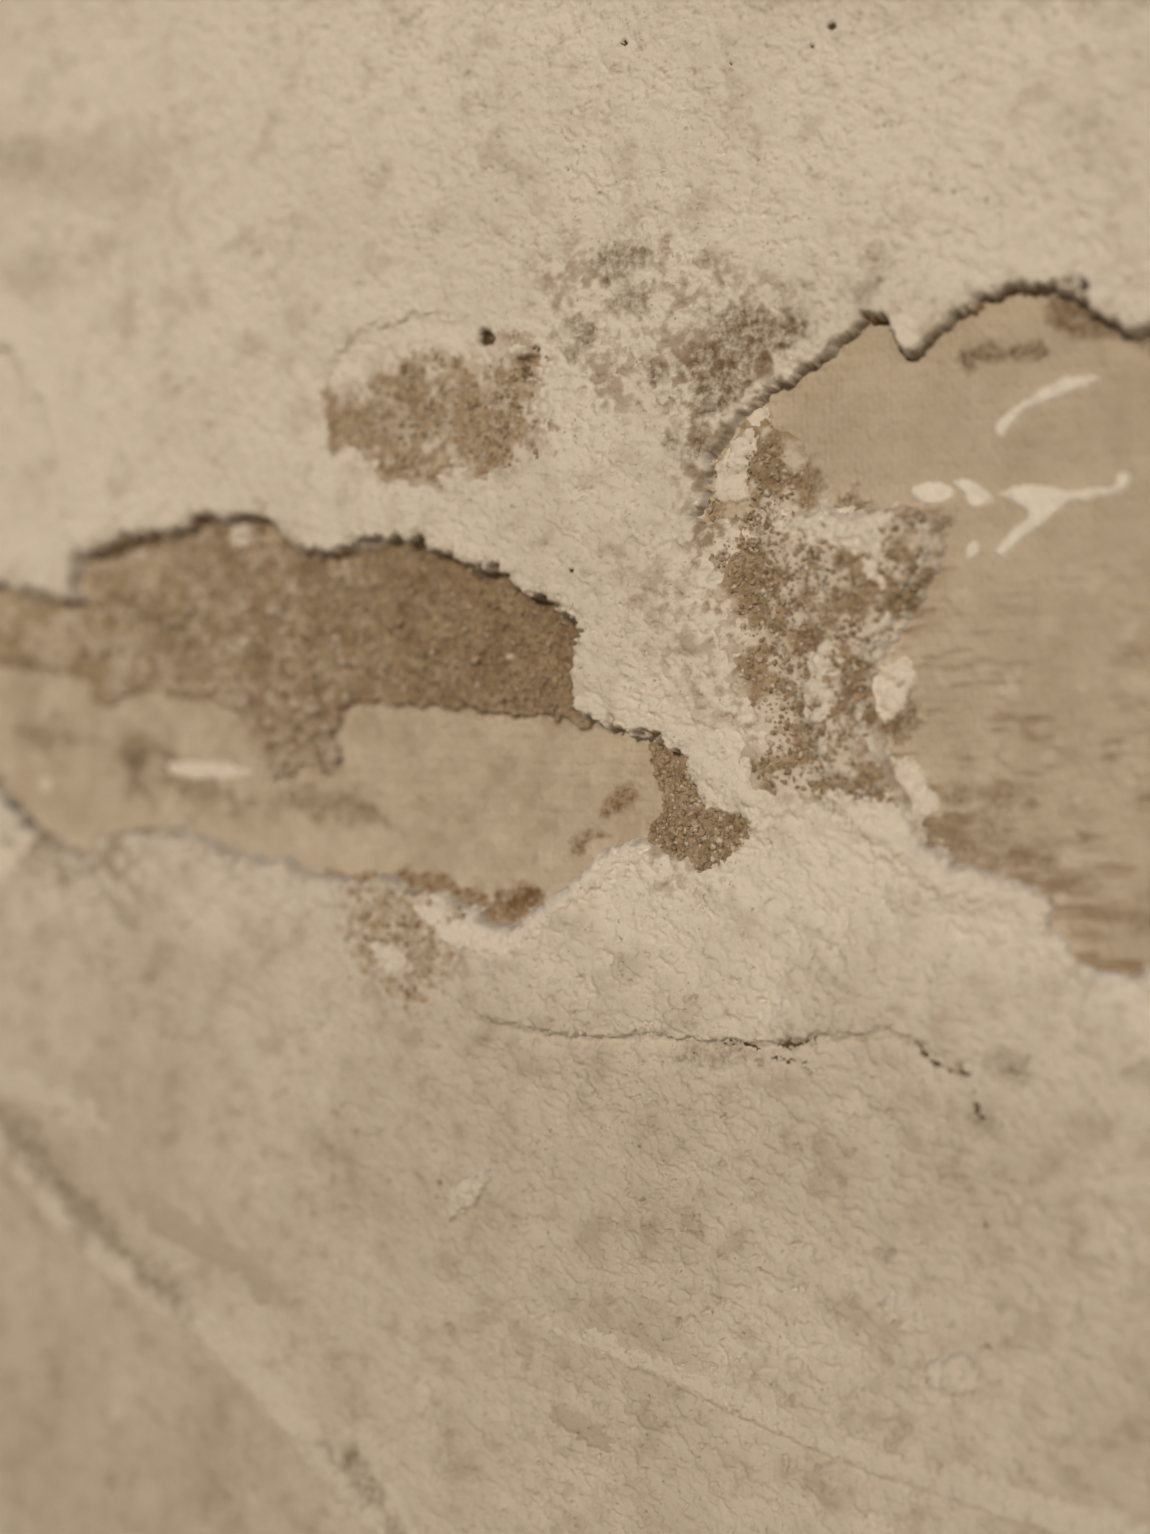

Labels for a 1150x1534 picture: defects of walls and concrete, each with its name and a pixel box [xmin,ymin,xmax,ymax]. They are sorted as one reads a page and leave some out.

flaking render [295,269,577,494]
flaking render [697,288,1150,1002]
flaking render [0,520,755,1012]
crack [693,1035,817,1073]
crack [906,1036,1002,1127]